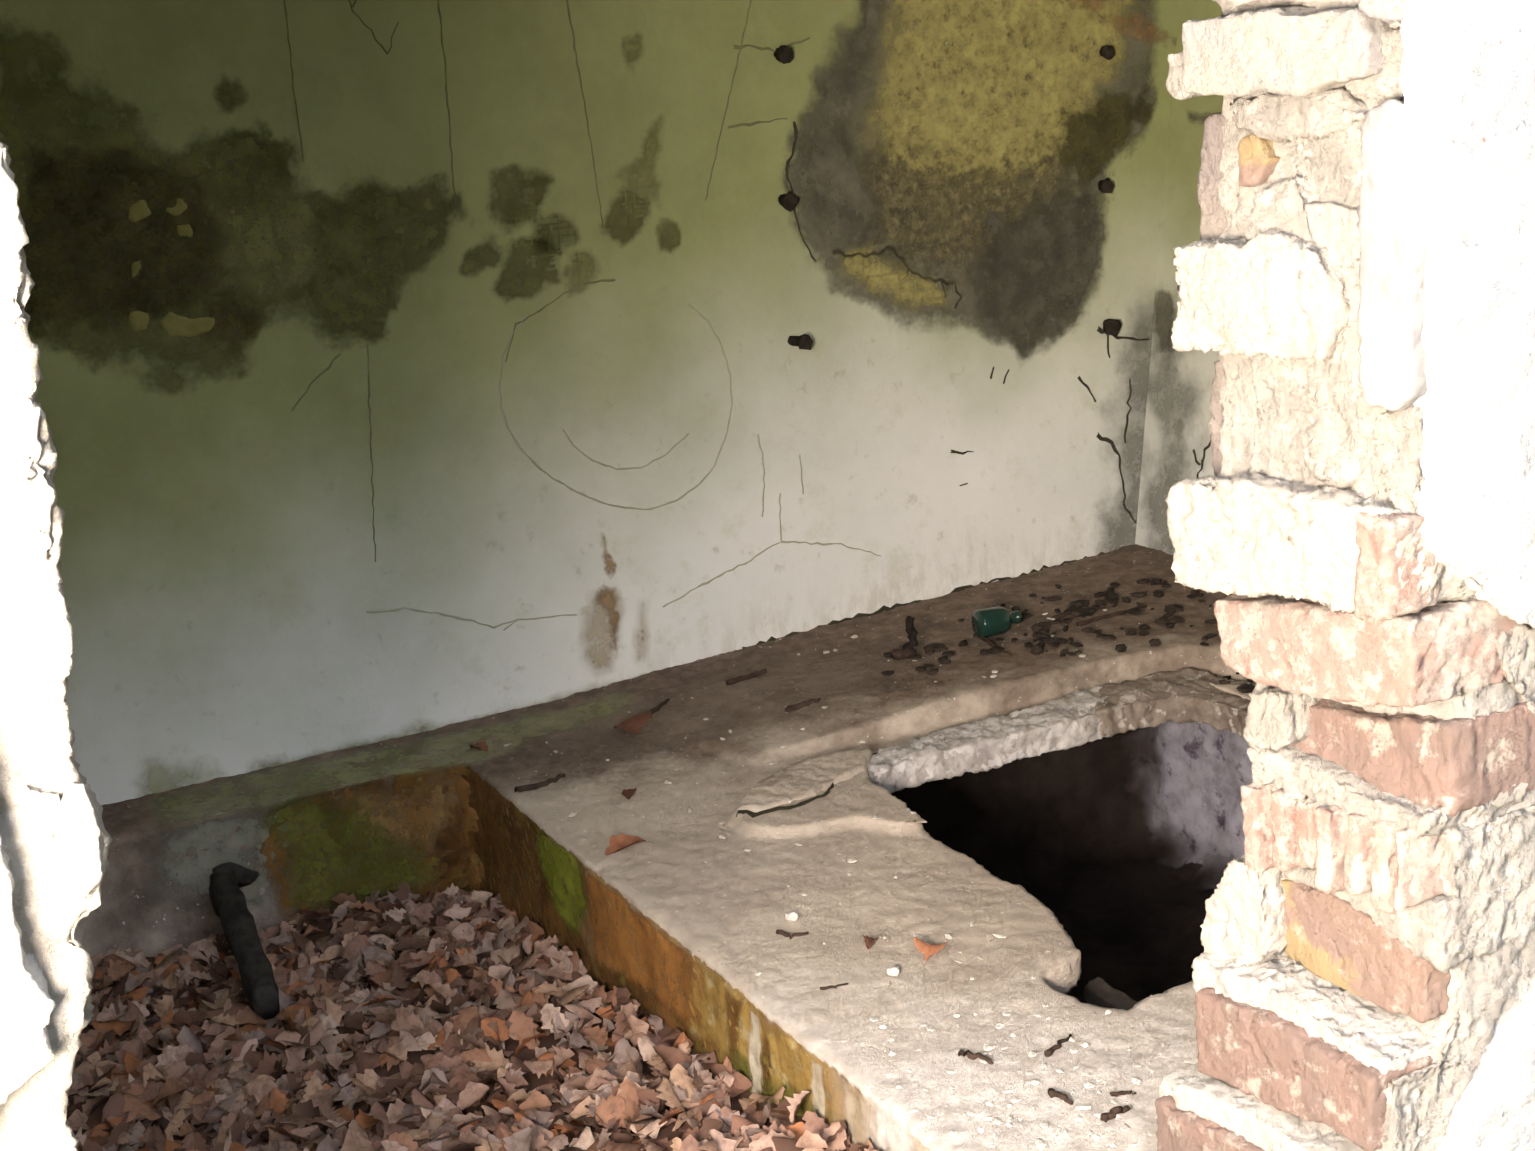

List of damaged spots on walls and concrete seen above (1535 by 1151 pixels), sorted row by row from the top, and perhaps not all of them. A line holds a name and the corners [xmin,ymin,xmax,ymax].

mould [0,31,463,394]
mould [461,165,595,300]
mould [606,123,681,251]
leakage [783,0,1163,357]
leakage [1104,292,1196,556]
crack [736,783,834,818]